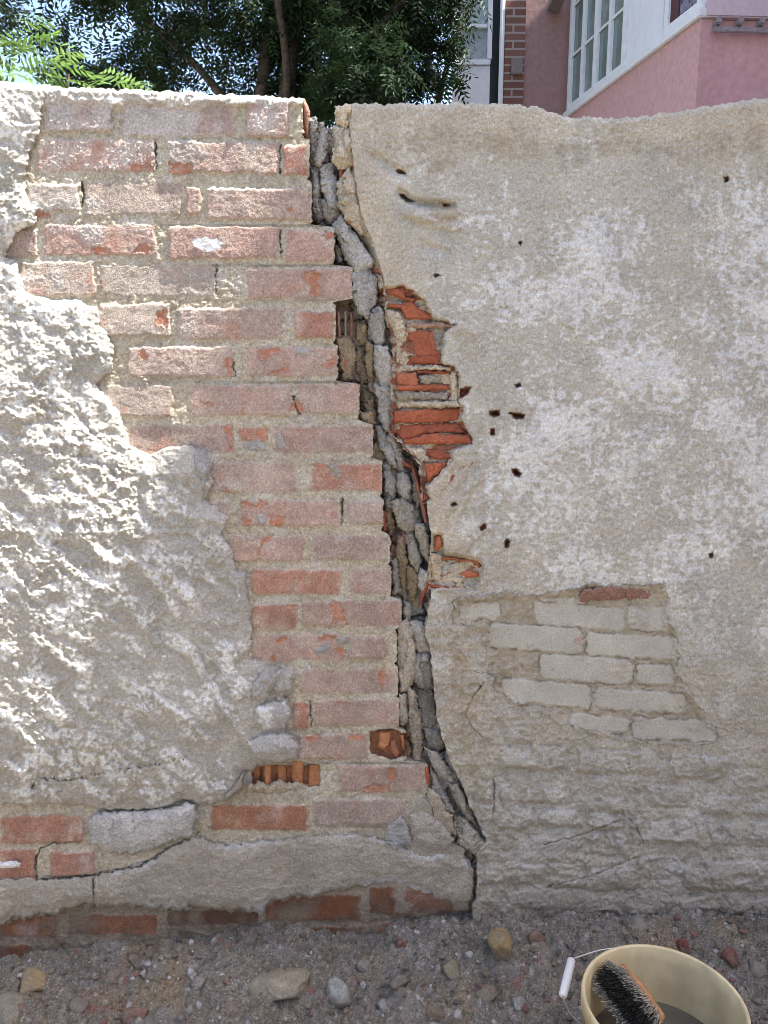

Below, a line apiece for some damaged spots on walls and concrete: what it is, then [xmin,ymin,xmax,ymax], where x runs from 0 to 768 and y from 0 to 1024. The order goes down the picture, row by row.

spalling [167,160,194,176]
spalling [91,245,111,257]
spalling [301,270,323,298]
spalling [154,307,170,329]
spalling [257,347,289,376]
spalling [383,285,473,504]
spalling [242,499,284,556]
crack [279,98,495,910]
peeling [428,533,722,746]
spalling [252,761,321,787]
spalling [347,729,407,794]
crack [34,831,199,906]